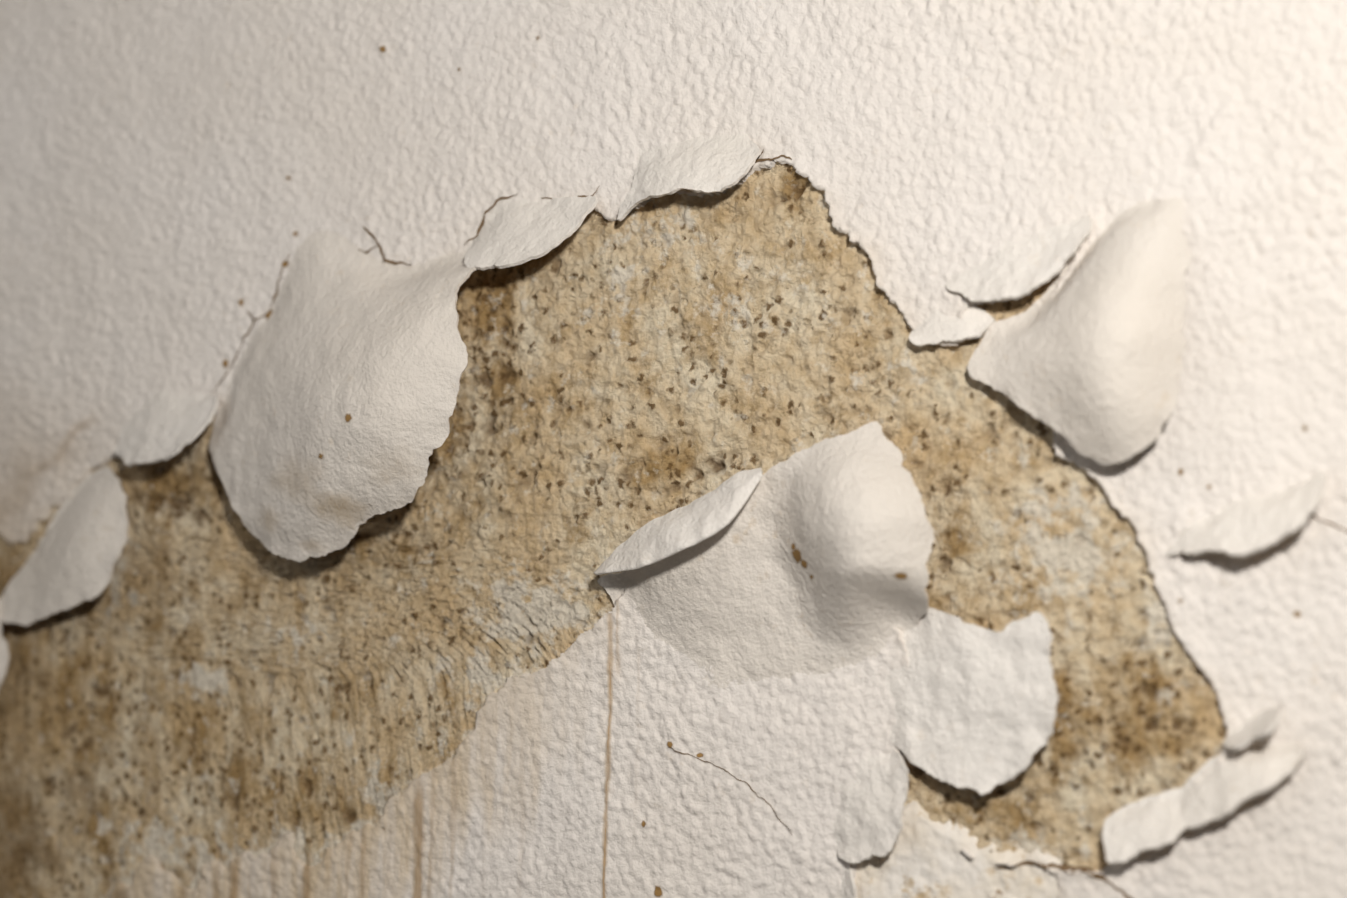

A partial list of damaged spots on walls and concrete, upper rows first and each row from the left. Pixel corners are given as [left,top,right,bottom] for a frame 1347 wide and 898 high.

spalling [0,130,1228,898]
peeling [1165,471,1328,558]
crack [1311,513,1347,532]
peeling [1221,705,1283,751]
crack [671,747,792,835]
peeling [1102,741,1306,864]
leakage [414,796,422,898]
crack [996,861,1132,898]